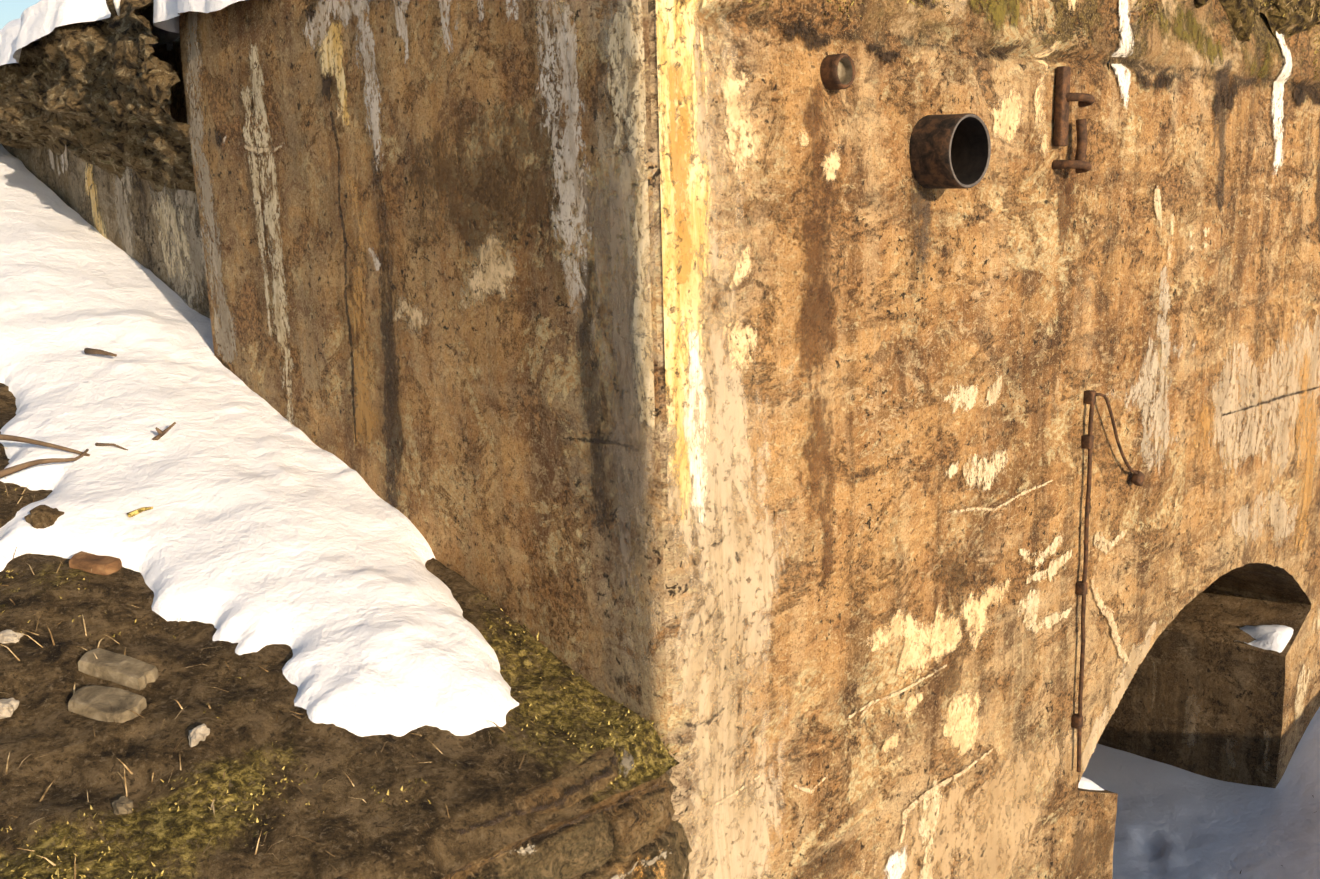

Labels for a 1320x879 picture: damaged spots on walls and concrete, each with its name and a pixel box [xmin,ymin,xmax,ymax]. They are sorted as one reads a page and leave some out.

damp [241,45,294,425]
damp [303,0,428,507]
damp [409,0,669,591]
damp [1108,0,1133,109]
damp [1126,186,1210,472]
damp [1158,8,1292,212]
damp [666,303,780,879]
damp [620,747,634,778]
damp [611,851,670,879]
damp [792,845,854,879]